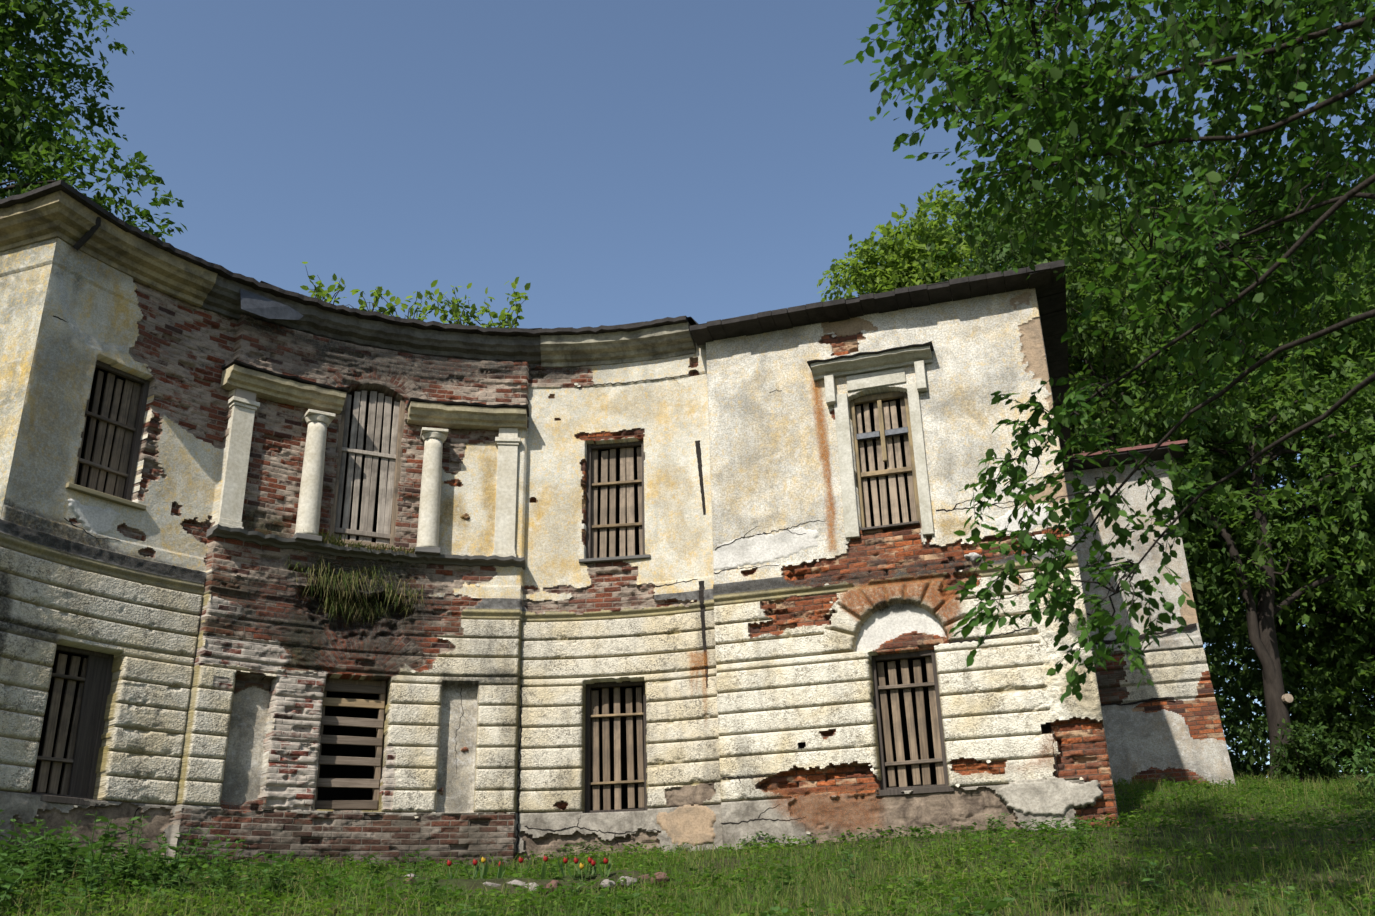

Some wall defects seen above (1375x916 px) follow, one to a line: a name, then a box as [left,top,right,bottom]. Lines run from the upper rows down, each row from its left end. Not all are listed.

peeling [819,317,878,356]
peeling [1009,292,1053,410]
spalling [68,279,594,597]
spalling [521,459,697,615]
spalling [574,428,645,444]
crack [695,440,706,515]
crack [654,520,824,688]
corrosion [813,377,835,547]
spalling [748,470,1072,639]
spalling [193,596,328,813]
peeling [755,729,1025,844]
spalling [1040,650,1225,829]